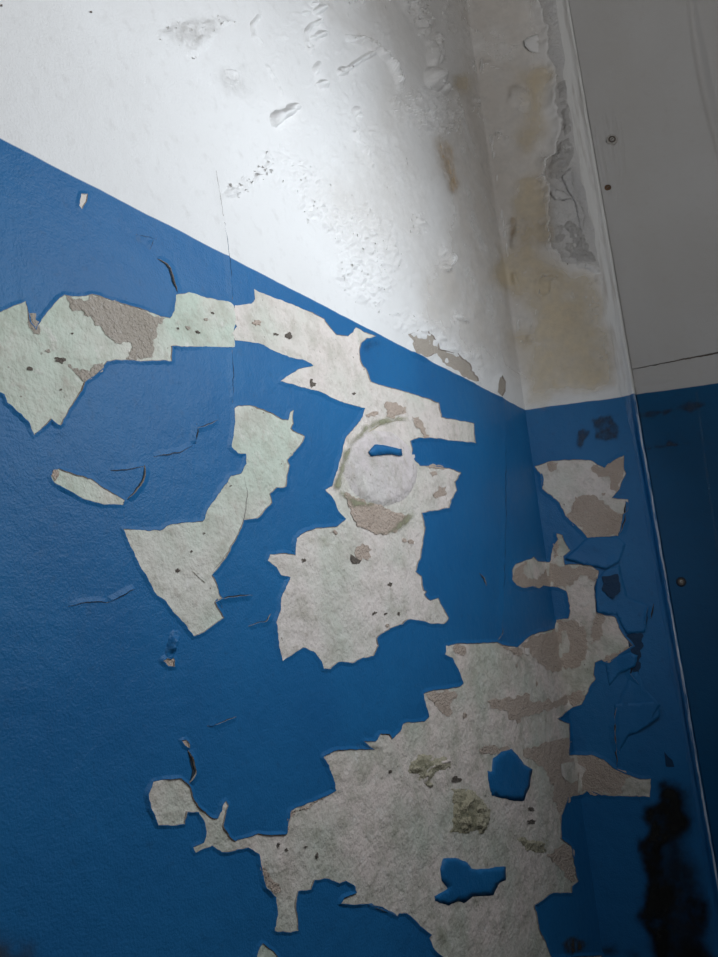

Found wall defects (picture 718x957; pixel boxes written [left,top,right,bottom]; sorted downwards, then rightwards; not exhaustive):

peeling [0,287,479,673]
flaking render [381,307,510,403]
damp [443,57,597,371]
peeling [143,452,660,957]
damp [638,783,711,957]